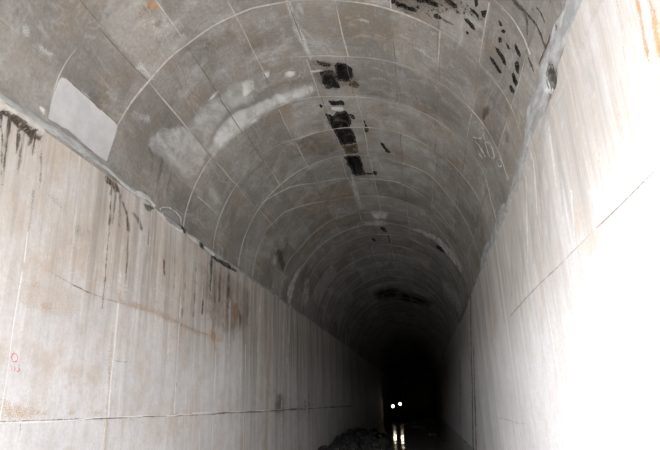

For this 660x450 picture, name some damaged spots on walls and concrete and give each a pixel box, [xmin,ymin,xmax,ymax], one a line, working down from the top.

spalling [308,60,359,90]
spalling [388,0,487,34]
spalling [490,21,521,94]
spalling [546,61,558,105]
rust [635,0,660,68]
leakage [0,109,43,231]
spalling [319,100,377,176]
leakage [102,176,150,307]
leakage [192,252,262,362]